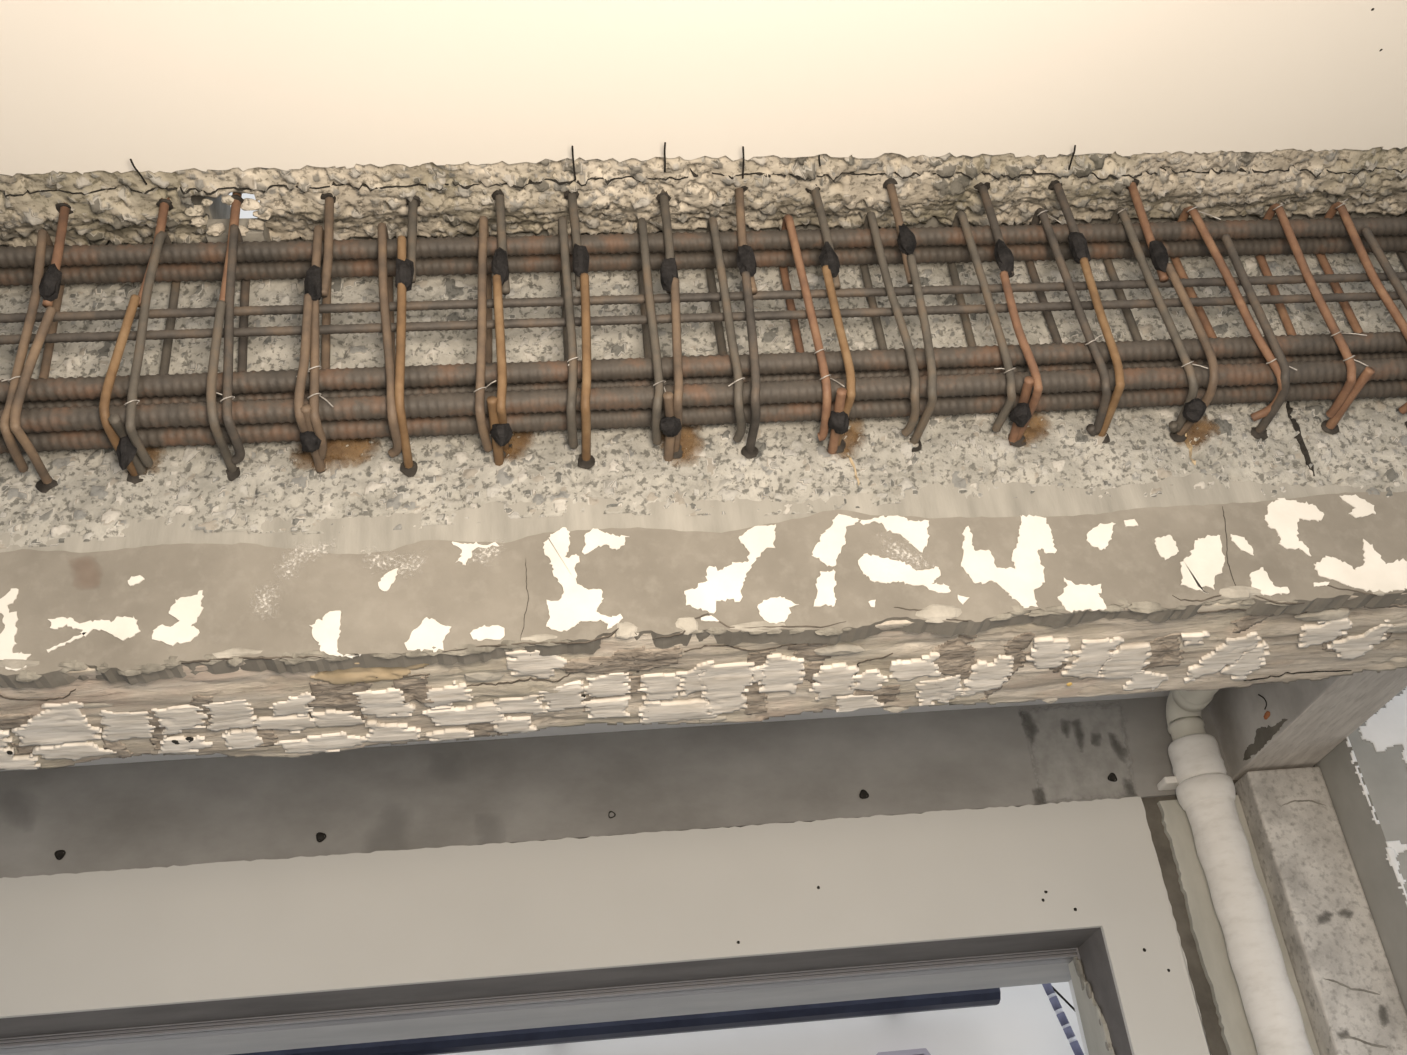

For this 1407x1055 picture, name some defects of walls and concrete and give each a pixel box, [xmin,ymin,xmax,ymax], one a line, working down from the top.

crack [4,165,1406,197]
spalling [185,195,271,236]
spalling [0,251,1407,380]
corrosion [297,438,376,467]
corrosion [504,431,532,458]
corrosion [840,421,862,456]
corrosion [1023,413,1047,443]
corrosion [1185,419,1216,445]
crack [1286,401,1315,476]
flaking render [0,396,1407,771]
peeling [1346,686,1407,824]
flaking render [1068,953,1115,1055]